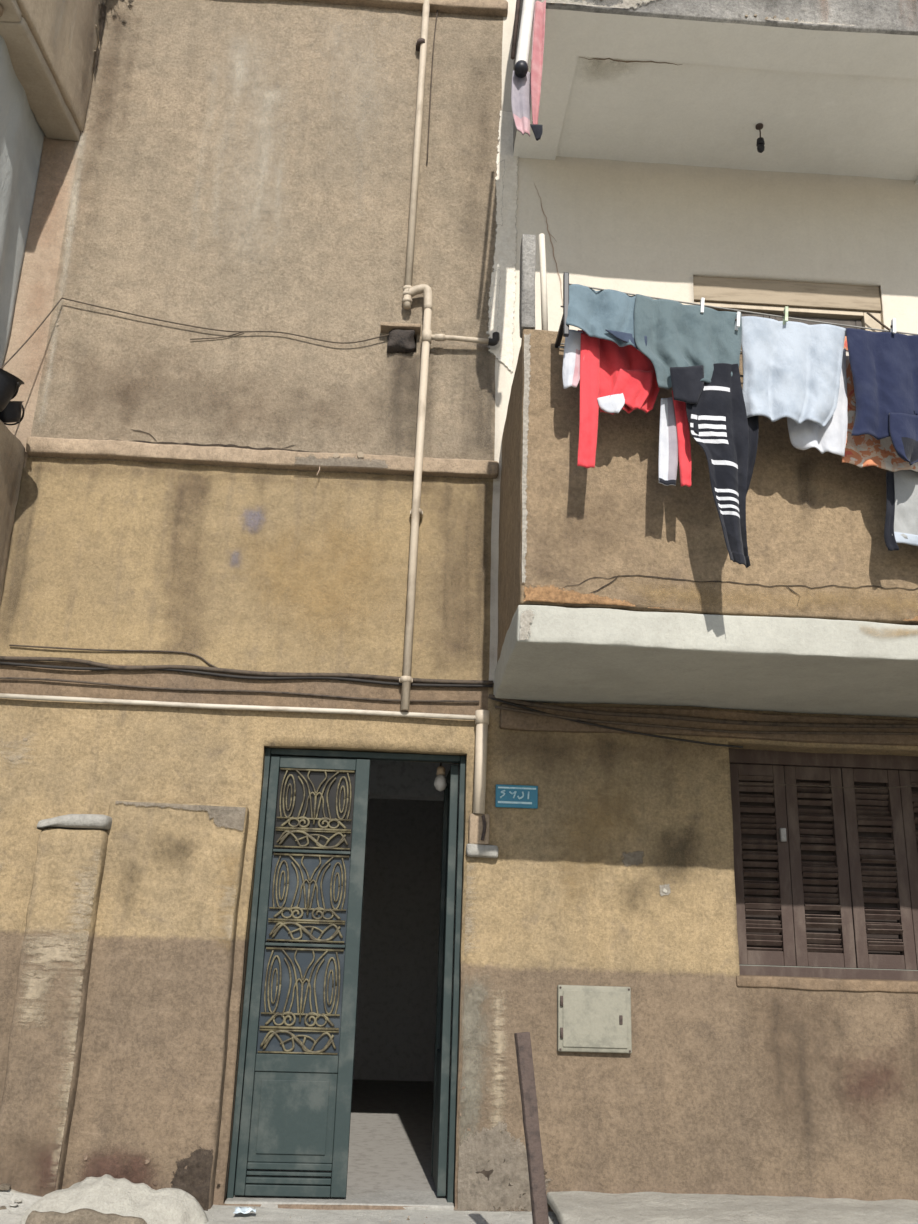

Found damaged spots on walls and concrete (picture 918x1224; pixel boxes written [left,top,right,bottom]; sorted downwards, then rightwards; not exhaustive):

crack [535,186,563,306]
crack [527,575,918,606]
flaking render [83,1147,220,1211]